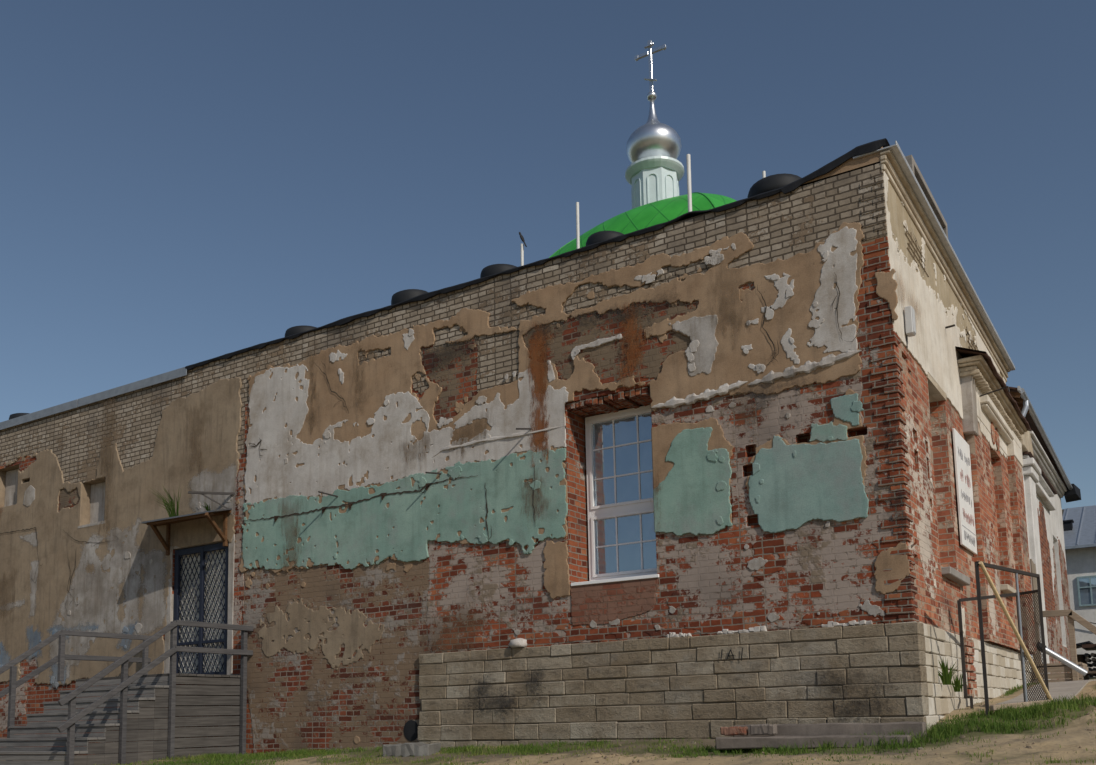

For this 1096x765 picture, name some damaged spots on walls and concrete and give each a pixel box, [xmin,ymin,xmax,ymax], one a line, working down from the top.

crack [757,286,779,366]
peeling [887,180,977,350]
spalling [59,488,80,510]
peeling [0,518,167,732]
crack [244,476,492,554]
spalling [189,226,941,754]
peeling [984,521,1001,639]
spalling [1037,501,1072,680]